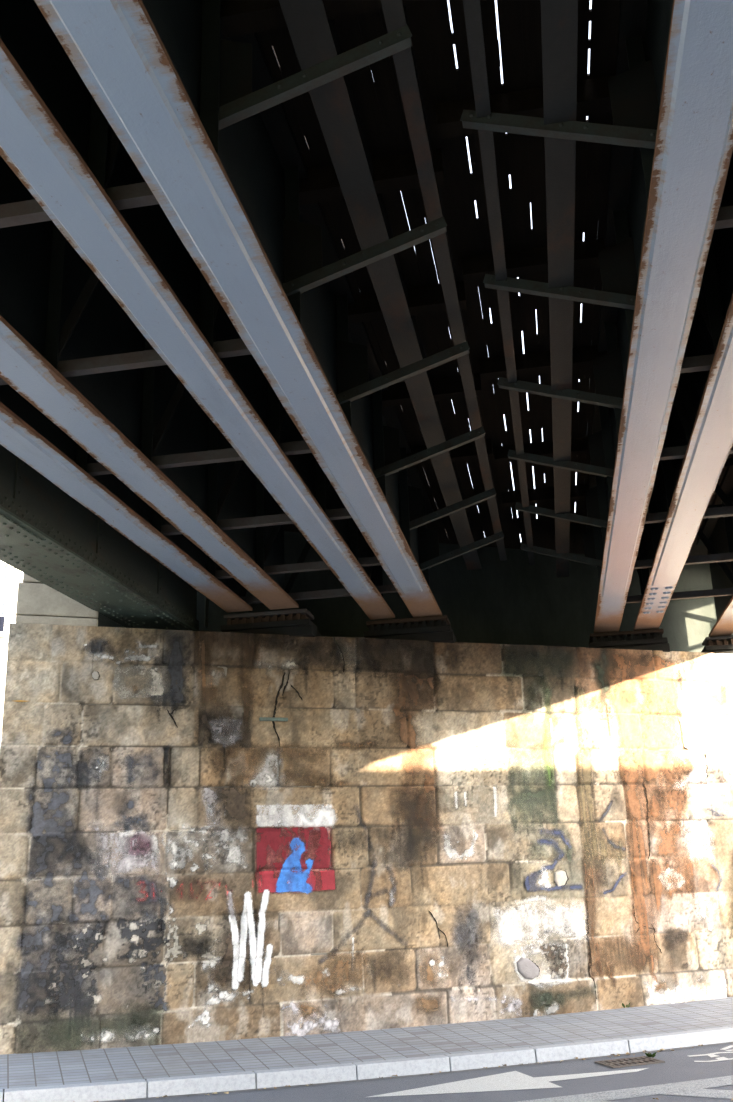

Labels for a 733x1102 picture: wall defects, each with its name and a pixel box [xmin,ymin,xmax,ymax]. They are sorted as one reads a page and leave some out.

crack [272,672,302,747]
crack [678,719,708,784]
corrosion [575,650,695,988]
damp [70,989,114,1041]